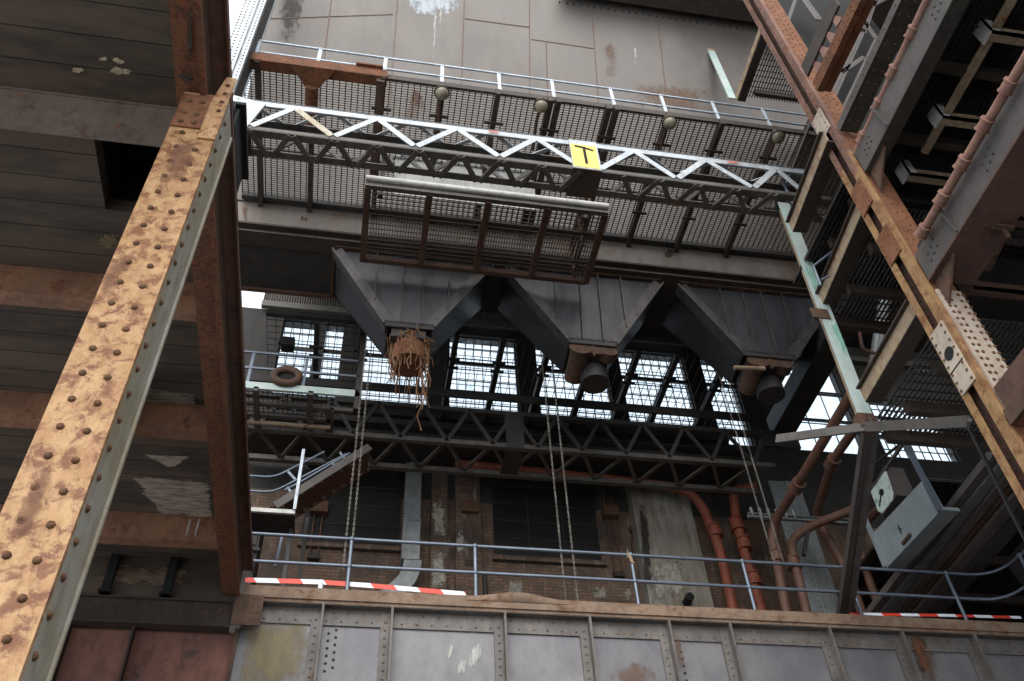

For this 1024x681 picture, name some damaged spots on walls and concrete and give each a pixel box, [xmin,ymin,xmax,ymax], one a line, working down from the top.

damp [280,0,302,38]
damp [409,0,454,55]
peeling [99,57,132,75]
corrosion [12,468,47,536]
spalling [134,454,213,517]
damp [640,506,651,584]